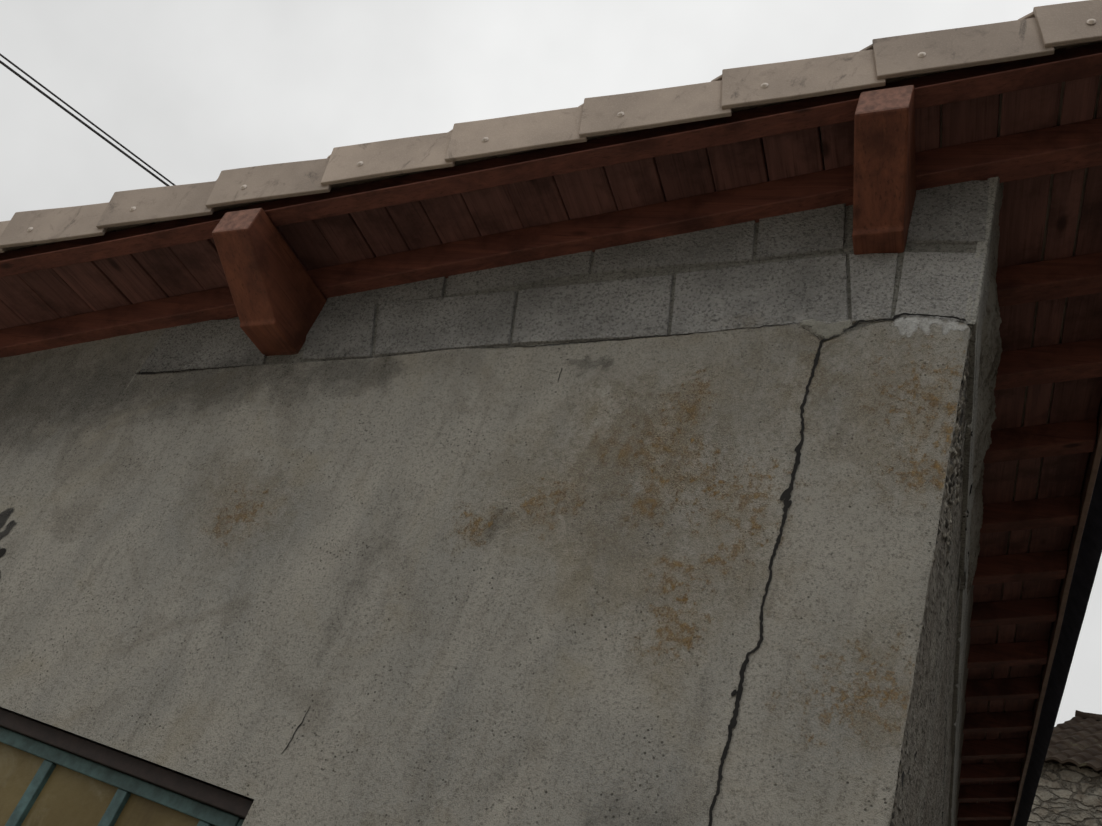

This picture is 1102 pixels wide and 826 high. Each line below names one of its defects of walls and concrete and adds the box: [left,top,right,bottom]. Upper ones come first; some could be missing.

damp [0,508,16,557]
crack [138,366,238,374]
corrosion [593,370,812,664]
crack [487,313,978,826]